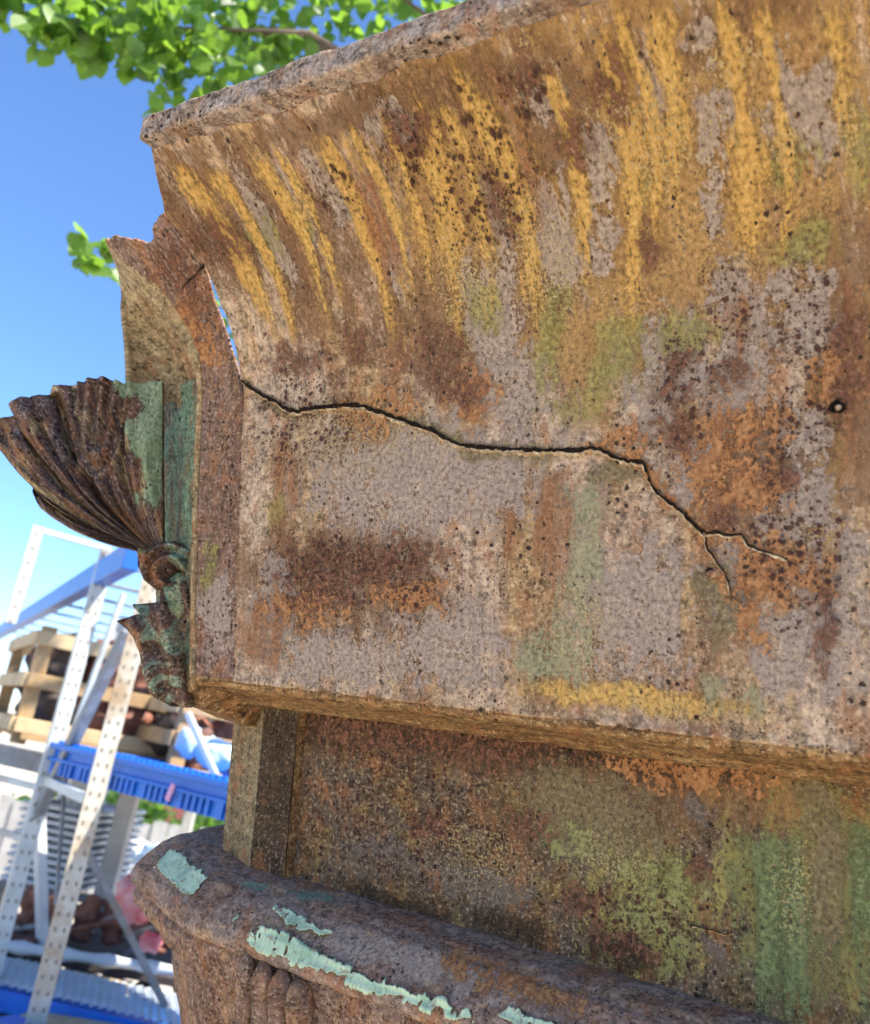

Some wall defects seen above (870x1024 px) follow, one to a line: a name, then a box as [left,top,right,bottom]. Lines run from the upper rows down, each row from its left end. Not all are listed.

leakage [316,62,543,331]
leakage [540,67,593,285]
leakage [597,7,692,321]
leakage [716,0,797,268]
leakage [825,13,858,148]
rust [148,0,870,682]
crack [241,379,787,600]
peeling [154,849,208,895]
peeling [246,905,554,1024]
rust [304,714,820,843]